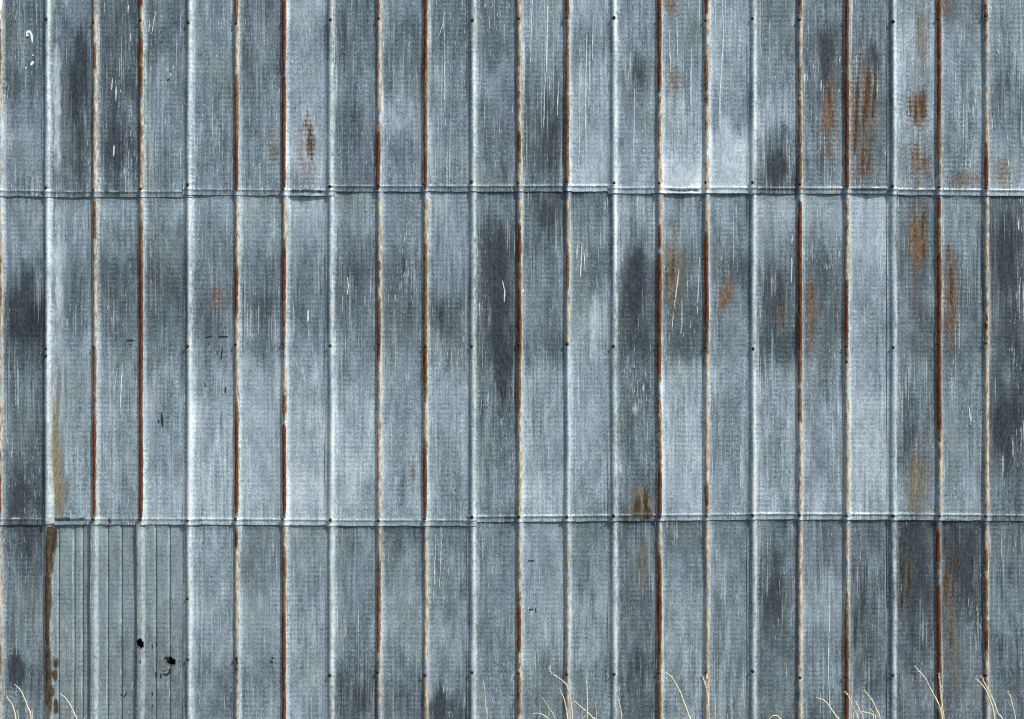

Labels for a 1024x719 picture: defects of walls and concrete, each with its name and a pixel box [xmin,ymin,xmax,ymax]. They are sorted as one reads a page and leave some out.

damp [53,27,89,172]
rust [299,114,316,184]
rust [820,0,878,185]
damp [491,229,512,400]
damp [628,248,643,322]
rust [631,0,686,719]
rust [905,0,1011,719]
rust [45,364,62,719]